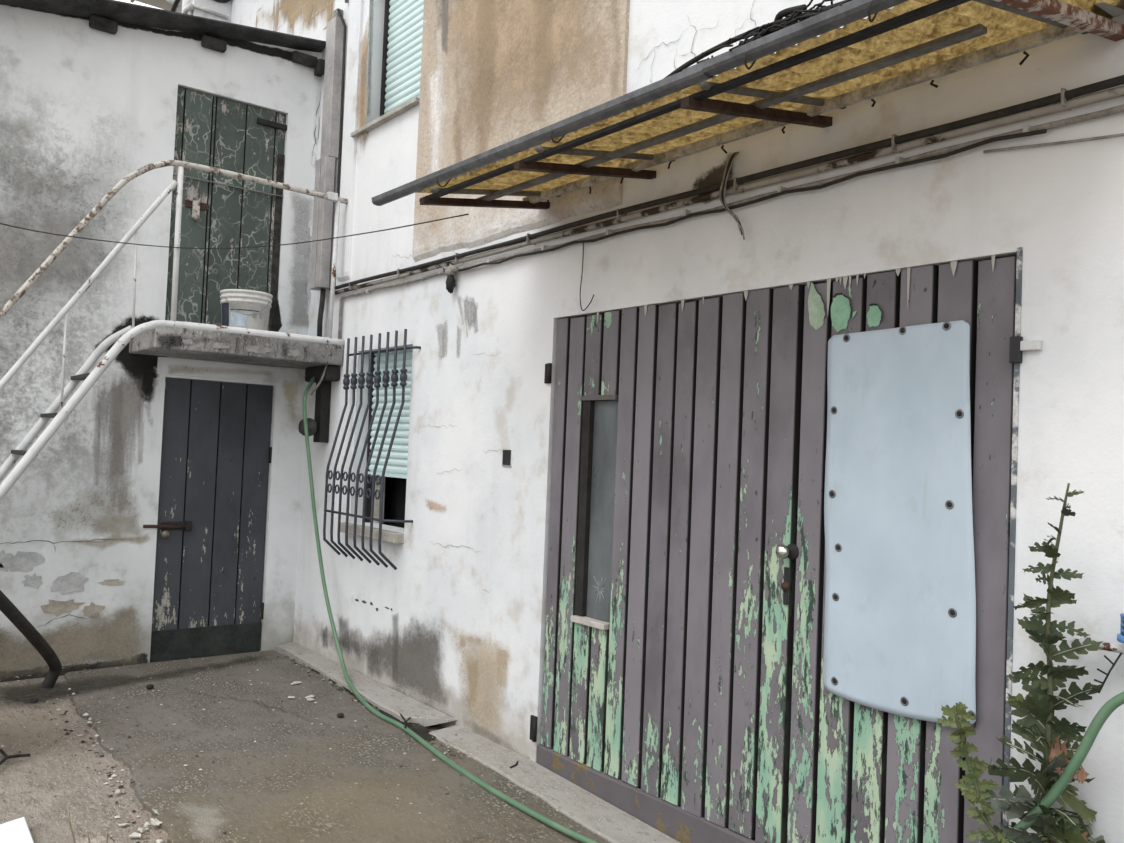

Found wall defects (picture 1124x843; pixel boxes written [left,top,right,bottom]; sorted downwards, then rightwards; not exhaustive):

leakage [436,0,591,122]
crack [636,5,756,80]
leakage [429,64,445,173]
leakage [57,316,183,530]
peeling [0,549,126,618]
leakage [322,622,442,705]
leakage [379,709,436,740]
leakage [460,641,511,750]